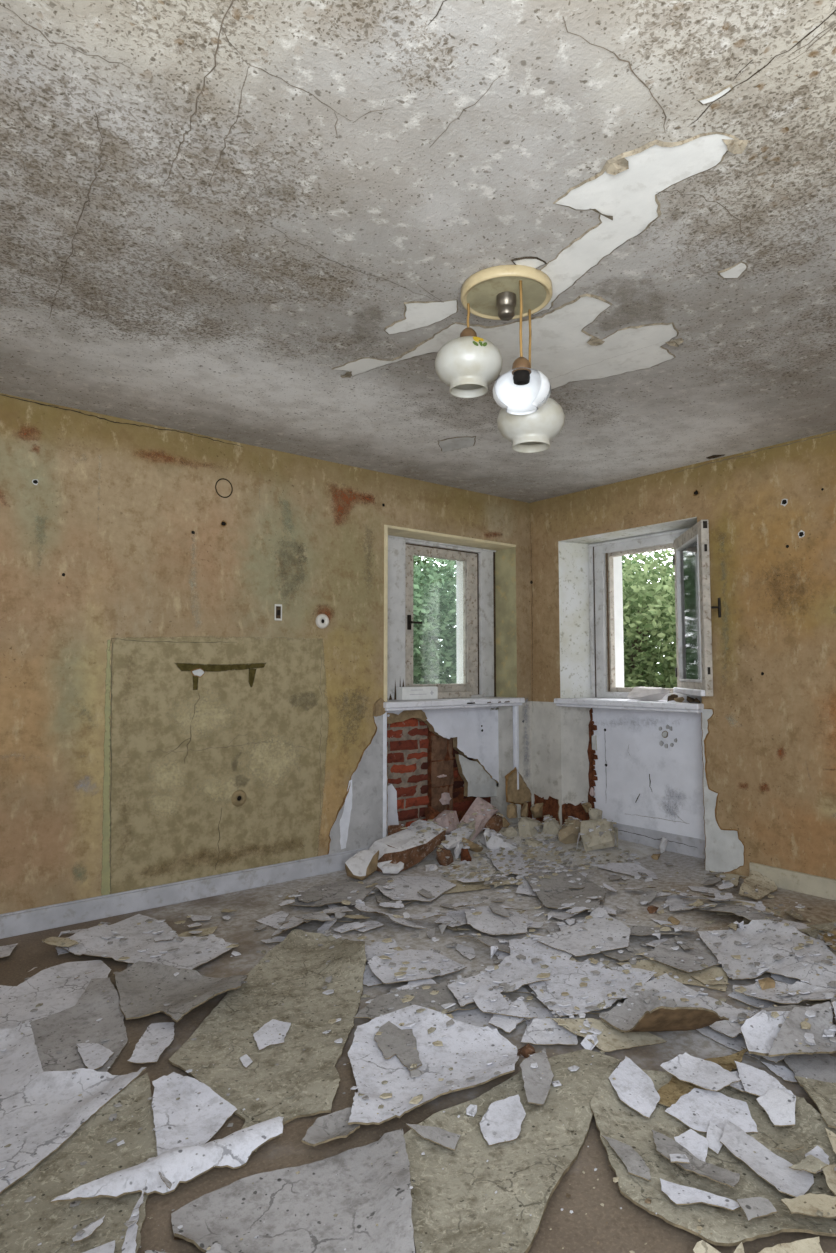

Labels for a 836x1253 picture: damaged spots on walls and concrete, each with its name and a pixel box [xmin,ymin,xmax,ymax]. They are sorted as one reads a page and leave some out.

crack [563,10,836,131]
peeling [697,84,734,105]
crack [49,113,114,318]
peeling [332,131,749,390]
rust [332,487,374,523]
spalling [327,698,427,855]
spalling [505,767,590,827]
peeling [659,725,677,748]
spalling [701,708,745,873]
peeling [441,880,491,895]
peeling [495,886,836,1017]
peeling [446,982,836,1222]